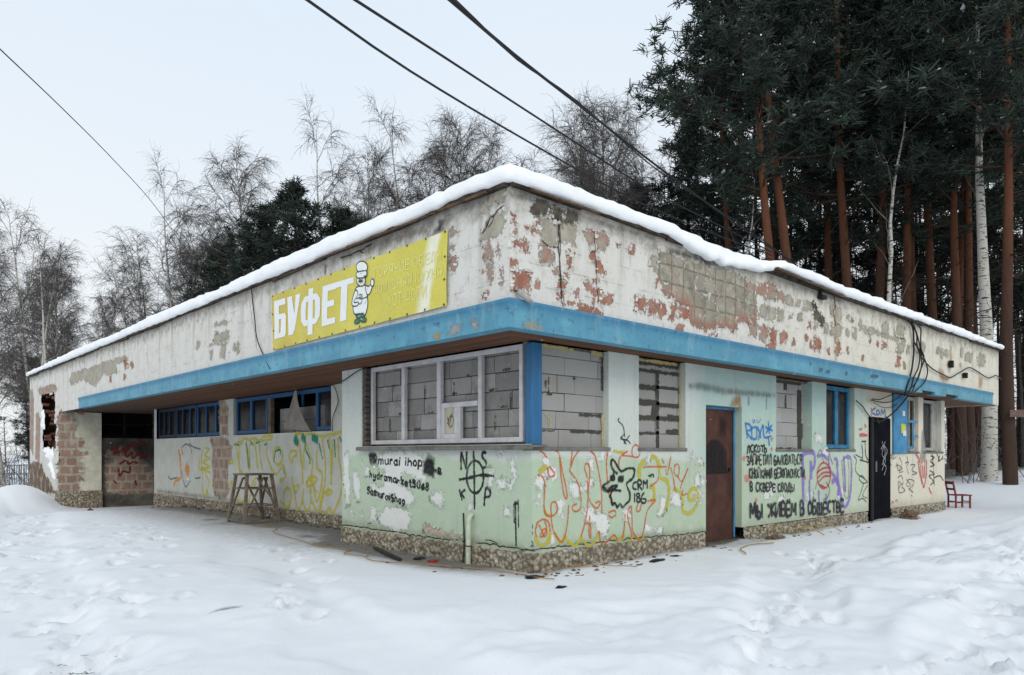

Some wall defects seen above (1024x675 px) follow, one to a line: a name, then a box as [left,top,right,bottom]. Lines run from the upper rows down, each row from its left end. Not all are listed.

peeling [70,355,134,386]
peeling [195,319,240,360]
crack [542,219,563,304]
spalling [478,188,636,315]
spalling [633,247,986,370]
spalling [29,384,89,494]
spalling [210,400,233,500]
peeling [342,450,466,544]
peeling [486,450,519,518]